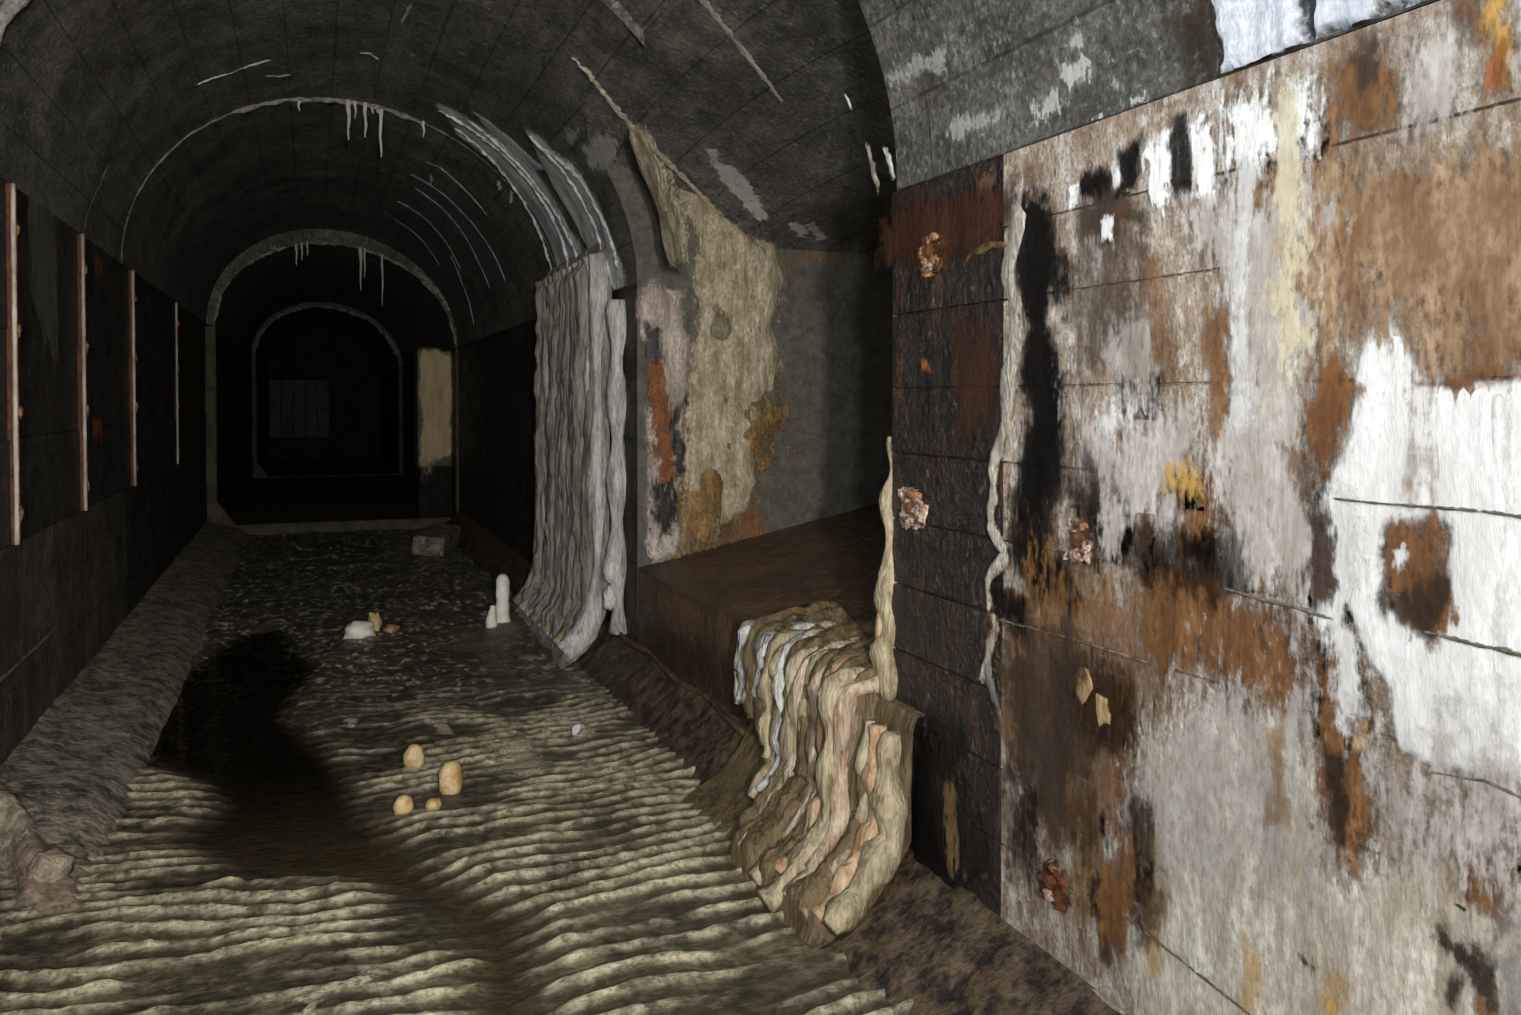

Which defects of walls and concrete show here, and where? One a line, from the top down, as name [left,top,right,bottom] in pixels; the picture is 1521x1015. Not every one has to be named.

efflorescence [0,0,31,46]
efflorescence [198,60,289,85]
efflorescence [141,97,422,189]
rust [874,171,1017,278]
rust [1452,0,1516,93]
efflorescence [213,162,505,472]
efflorescence [436,57,811,564]
leakage [979,0,1521,1015]
rust [1140,28,1521,882]
leakage [911,719,986,889]